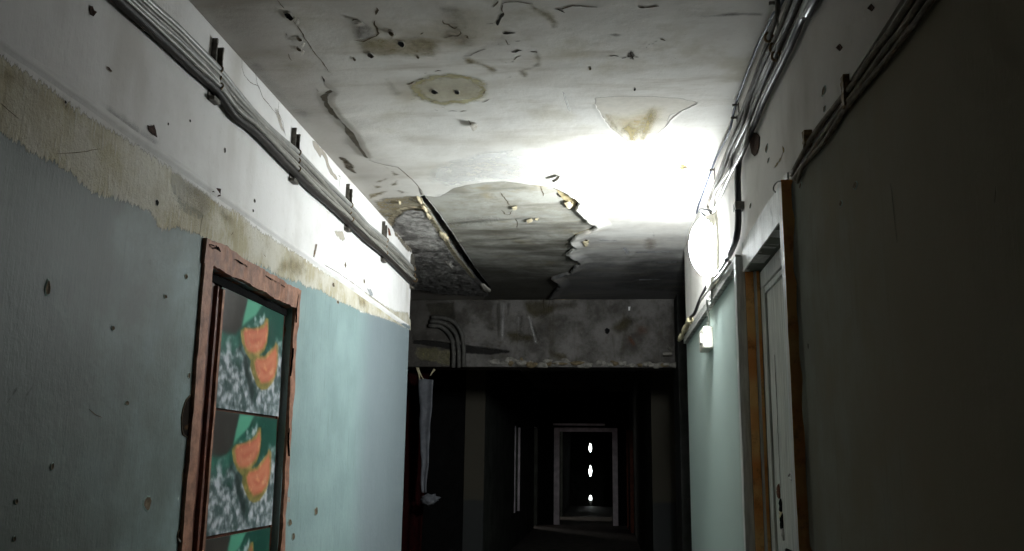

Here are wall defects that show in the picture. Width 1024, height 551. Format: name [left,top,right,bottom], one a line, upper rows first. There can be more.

crack [277,0,334,92]
crack [352,8,380,42]
damp [407,70,489,105]
crack [491,1,530,26]
peeling [0,55,411,331]
peeling [320,74,613,300]